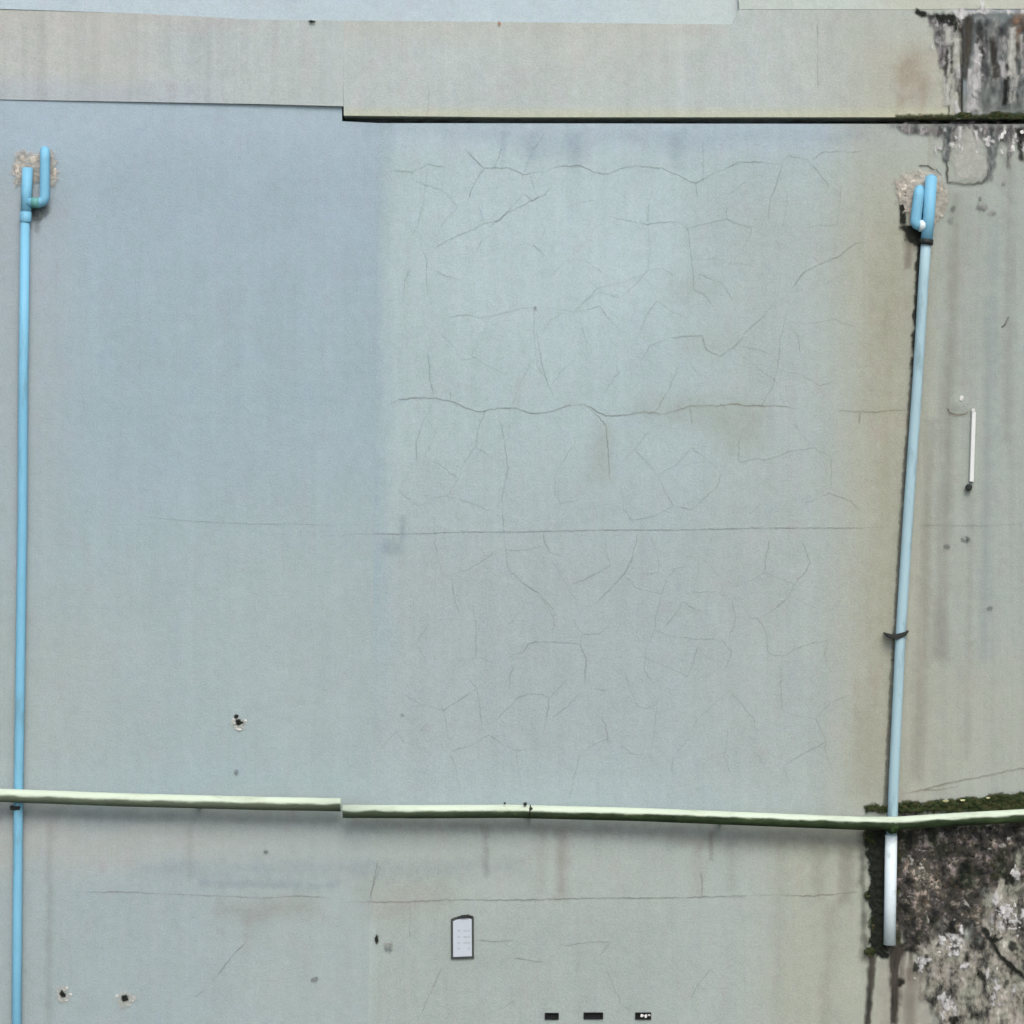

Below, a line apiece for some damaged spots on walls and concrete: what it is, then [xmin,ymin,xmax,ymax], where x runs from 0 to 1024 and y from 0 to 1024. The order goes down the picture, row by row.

peeling [931,21,962,105]
peeling [975,22,1024,105]
spalling [11,150,59,186]
spalling [894,170,948,225]
peeling [934,126,1024,178]
damp [882,822,1024,1004]